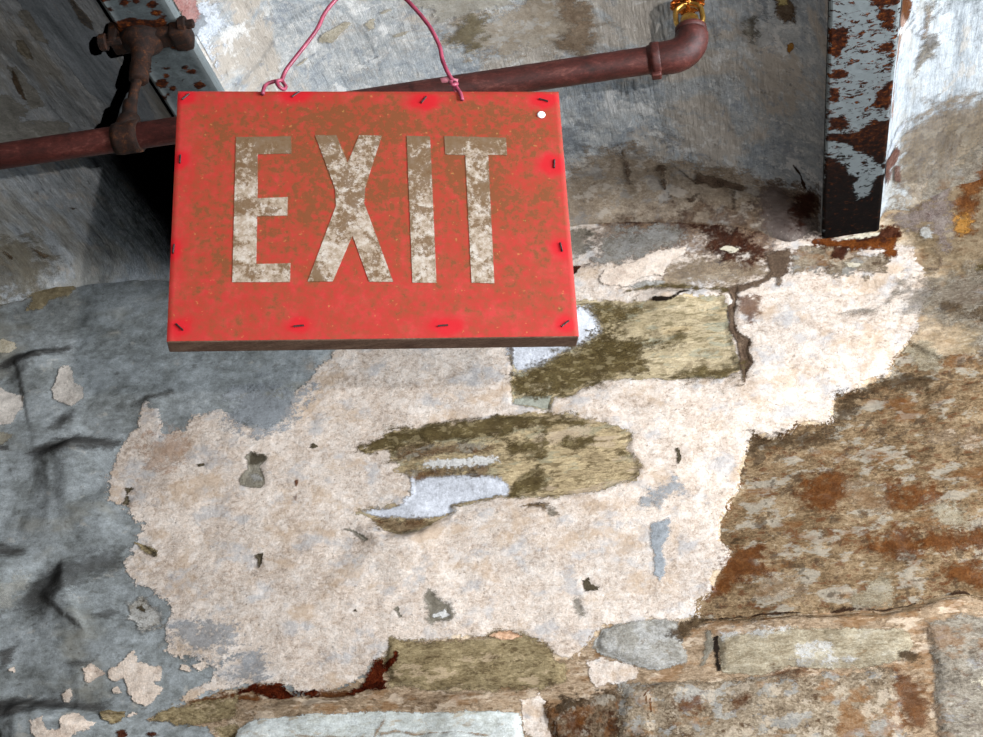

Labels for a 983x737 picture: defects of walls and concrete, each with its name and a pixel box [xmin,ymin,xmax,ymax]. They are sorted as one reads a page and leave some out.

corrosion [174,0,207,36]
corrosion [807,224,904,260]
peeling [0,338,17,353]
crack [626,272,774,383]
peeling [0,388,24,445]
peeling [26,224,983,737]